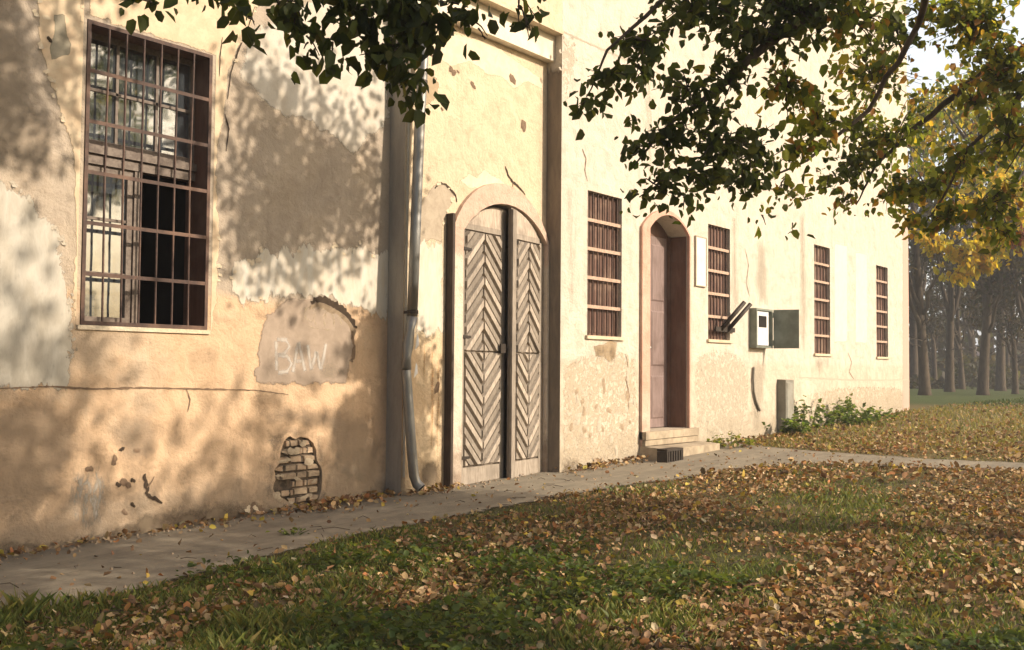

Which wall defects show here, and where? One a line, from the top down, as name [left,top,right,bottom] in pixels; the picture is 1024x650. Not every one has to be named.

peeling [426,33,543,111]
peeling [0,0,390,391]
crack [505,166,525,194]
crack [0,385,288,410]
spalling [116,478,136,489]
spalling [270,437,320,505]